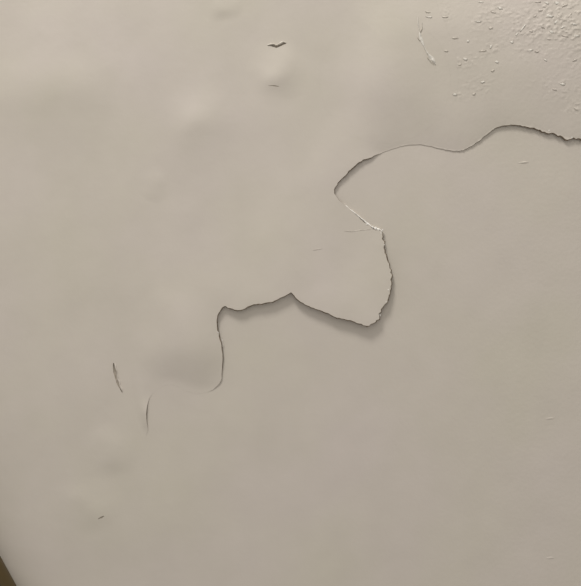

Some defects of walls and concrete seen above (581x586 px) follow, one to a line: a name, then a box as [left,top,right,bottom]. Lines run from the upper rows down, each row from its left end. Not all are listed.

crack [268,40,287,48]
flaking render [117,0,581,434]
crack [113,363,123,392]